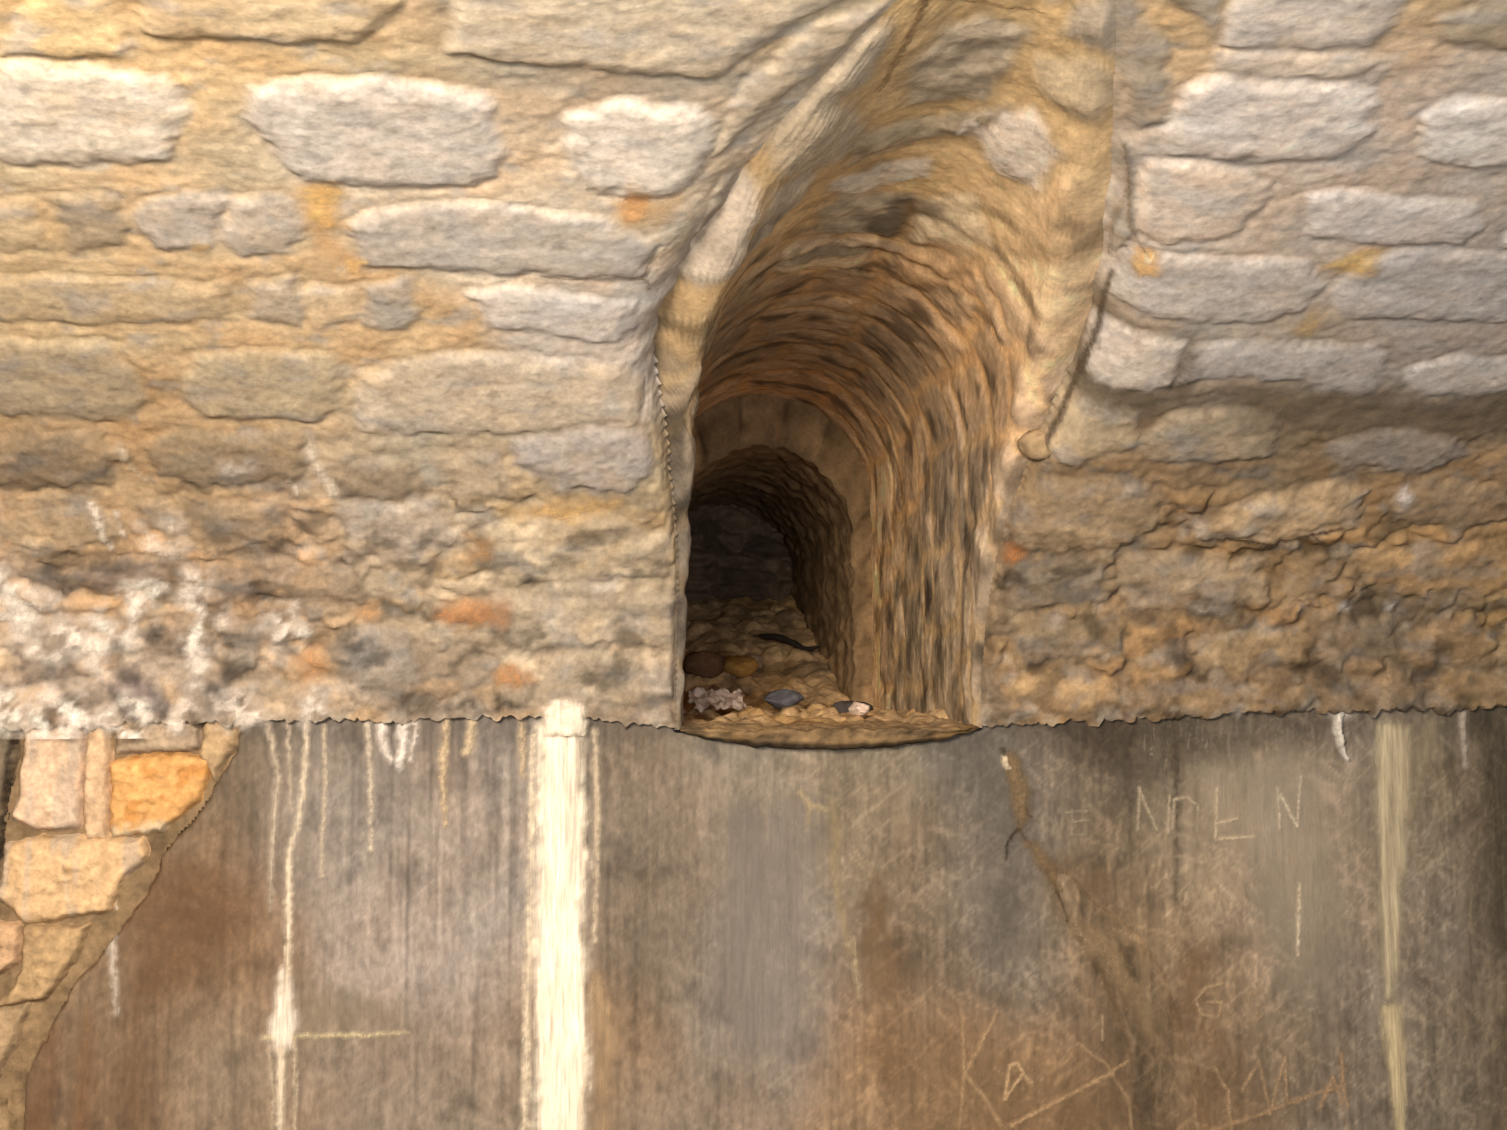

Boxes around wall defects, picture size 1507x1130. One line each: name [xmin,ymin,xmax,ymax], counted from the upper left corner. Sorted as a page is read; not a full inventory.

crack [882,0,928,88]
crack [972,0,1031,10]
damp [0,691,151,739]
damp [54,581,159,667]
damp [168,574,205,731]
damp [274,619,306,640]
crack [0,740,18,858]
crack [1003,751,1063,892]
spalling [0,721,243,1130]
damp [216,696,400,1130]
damp [522,700,611,1130]
damp [1377,722,1433,1130]